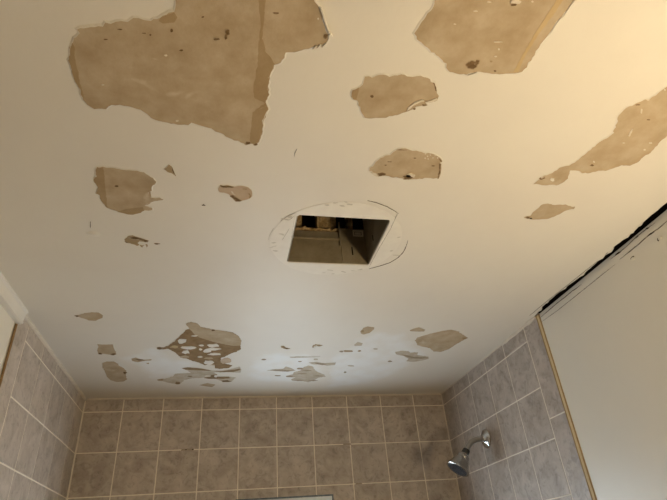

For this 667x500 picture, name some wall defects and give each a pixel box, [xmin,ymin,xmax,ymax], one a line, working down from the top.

peeling [412,0,576,76]
peeling [66,0,333,146]
peeling [350,73,440,119]
peeling [533,85,667,186]
peeling [368,147,443,180]
peeling [93,166,164,215]
peeling [217,184,253,202]
peeling [524,203,575,220]
crack [533,221,667,321]
peeling [157,322,242,387]
peeling [267,344,336,382]
peeling [395,327,468,362]